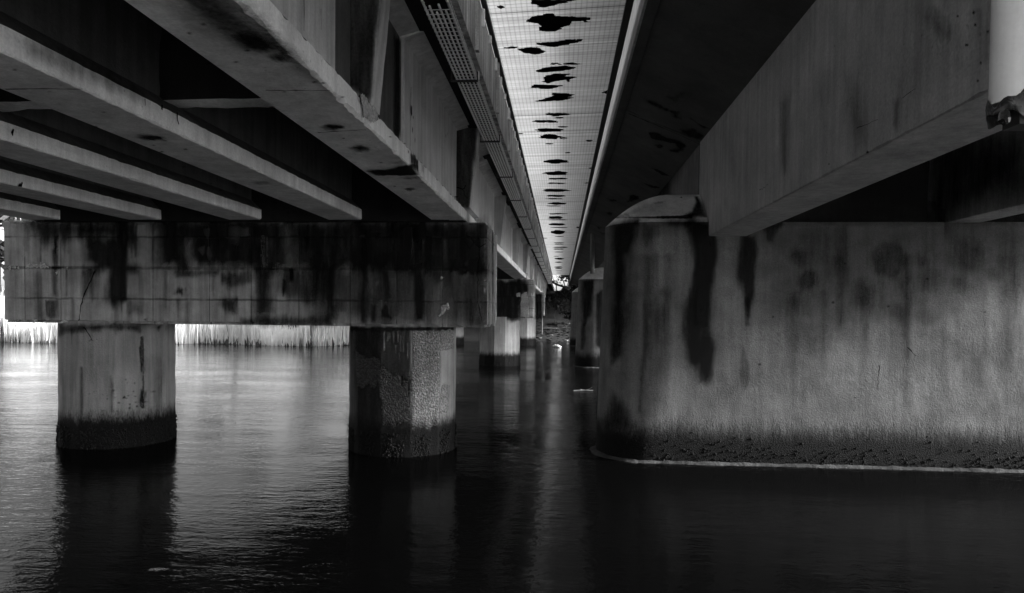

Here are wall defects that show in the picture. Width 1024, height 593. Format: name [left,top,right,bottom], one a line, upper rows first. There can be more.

water stain [30,220,141,335]
crack [78,271,95,341]
water stain [157,127,542,437]
water stain [581,195,718,379]
water stain [738,223,782,317]